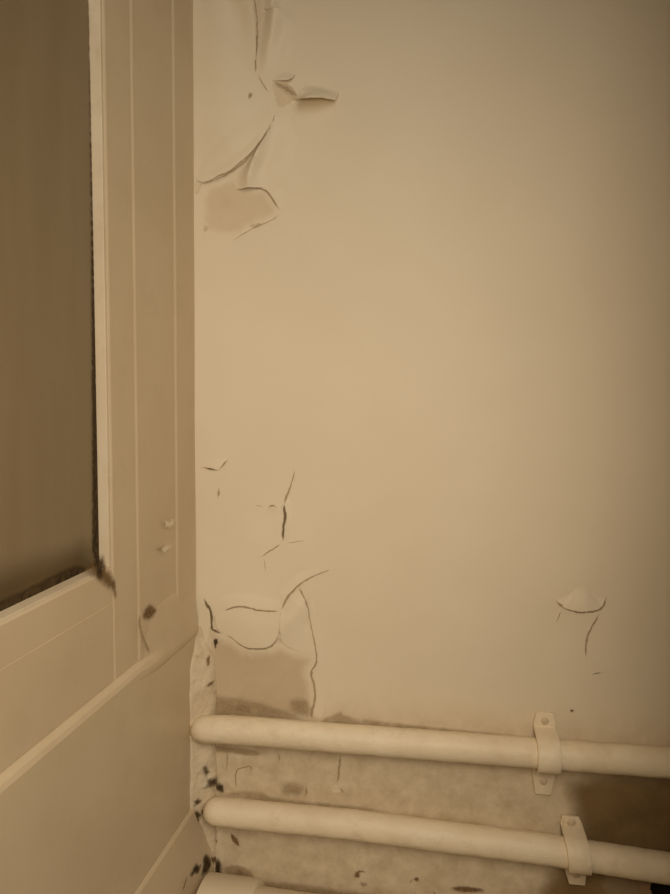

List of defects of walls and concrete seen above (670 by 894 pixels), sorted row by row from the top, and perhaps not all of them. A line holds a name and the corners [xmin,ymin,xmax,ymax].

peeling [201,0,294,88]
peeling [194,107,299,238]
crack [201,457,227,495]
crack [257,475,299,563]
spalling [200,569,329,717]
water stain [216,698,308,718]
water stain [204,767,239,795]
water stain [577,780,670,852]
water stain [183,855,252,889]
water stain [265,884,347,894]
water stain [546,869,636,894]